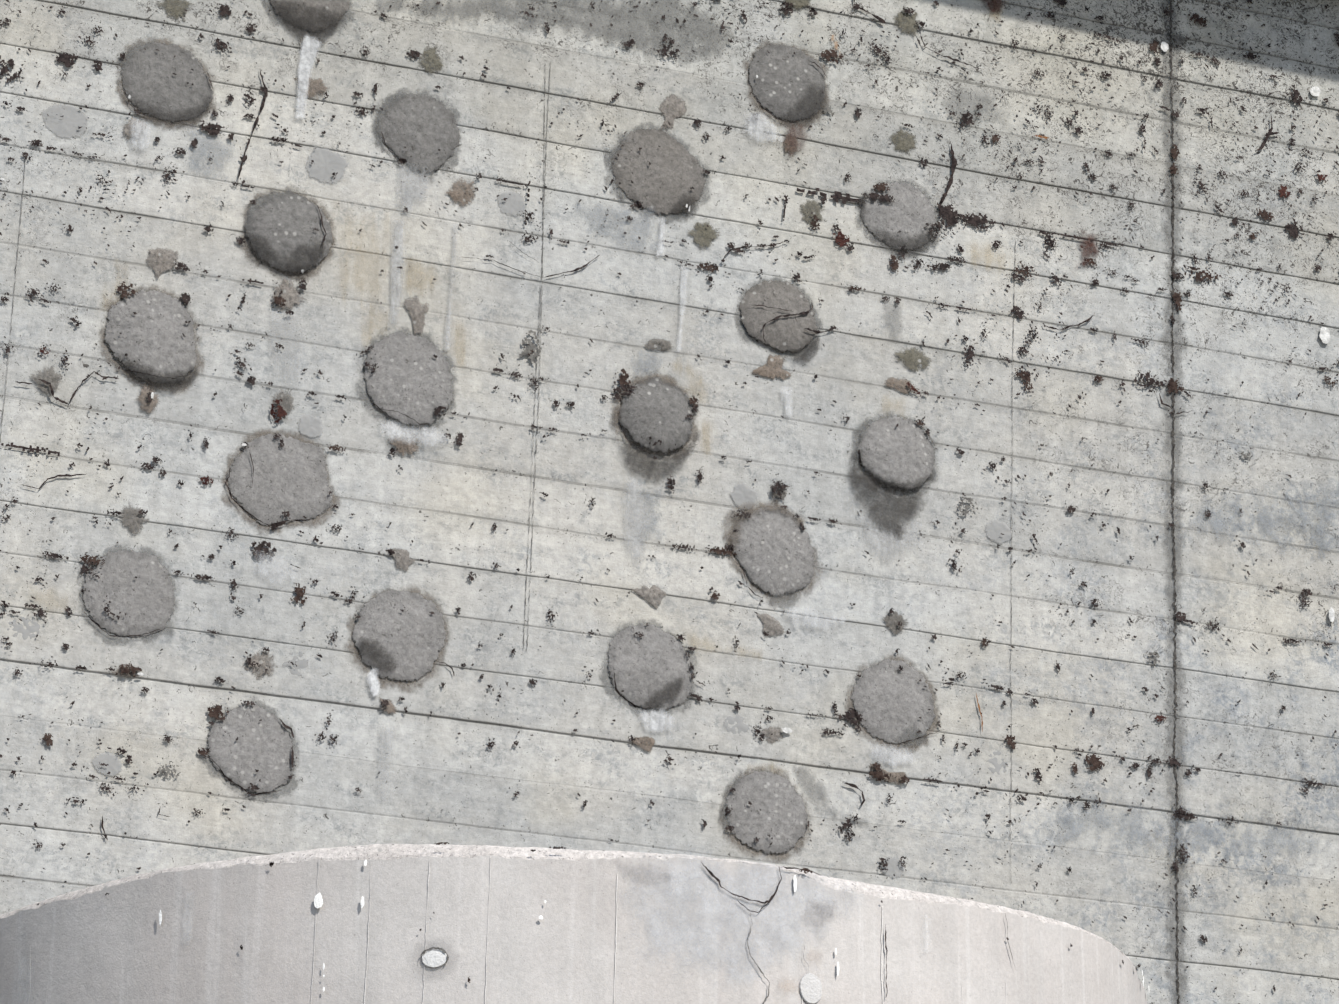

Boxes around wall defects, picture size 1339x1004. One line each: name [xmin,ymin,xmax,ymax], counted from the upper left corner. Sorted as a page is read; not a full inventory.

damp [419,0,730,61]
crack [755,300,832,342]
damp [850,451,933,553]
crack [701,862,822,1004]